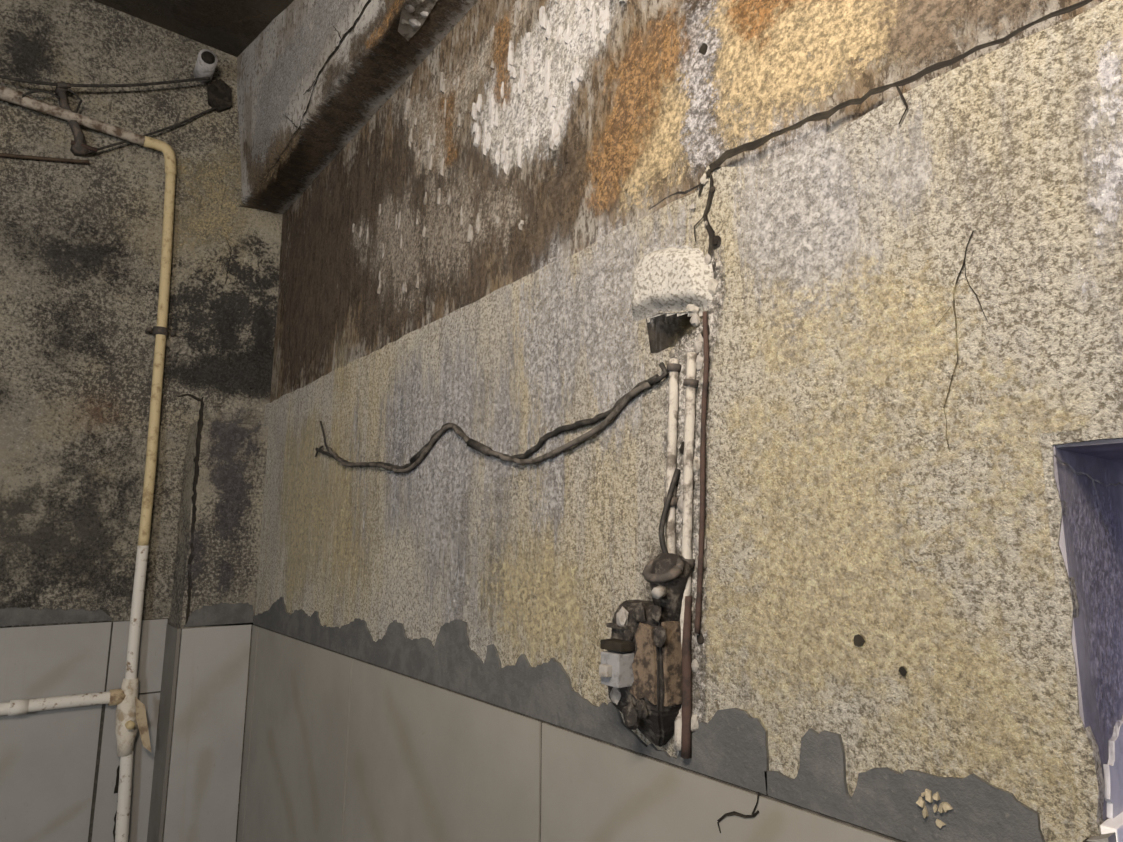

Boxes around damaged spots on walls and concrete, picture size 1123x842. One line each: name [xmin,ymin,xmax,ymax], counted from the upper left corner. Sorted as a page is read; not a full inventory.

water stain [0,215,127,286]
water stain [35,302,106,367]
water stain [145,0,634,624]
flaking render [646,221,726,733]
crack [649,0,1093,308]
peeling [916,789,953,828]